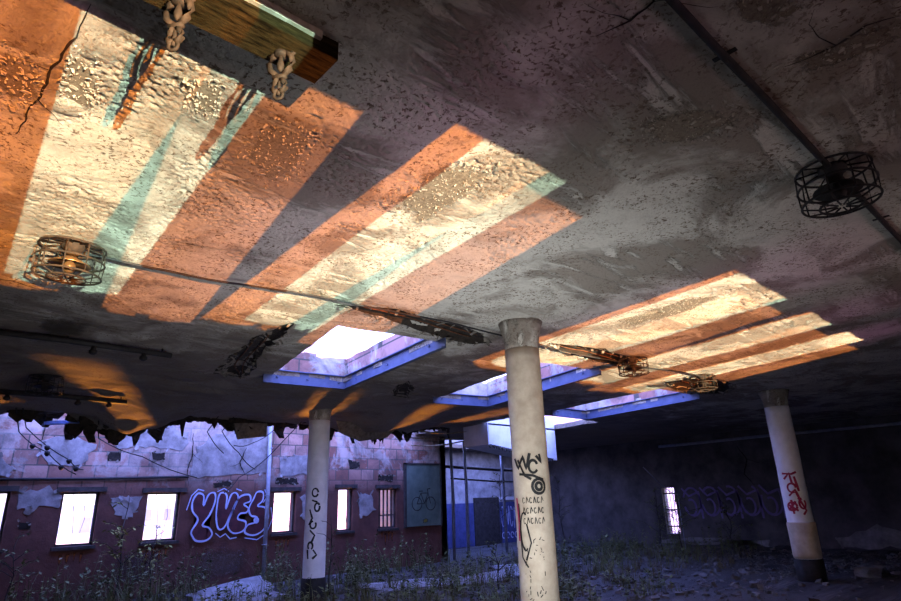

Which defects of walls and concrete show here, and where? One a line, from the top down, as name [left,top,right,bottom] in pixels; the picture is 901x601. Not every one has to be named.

crack [1,4,91,146]
peeling [0,452,16,477]
peeling [36,437,97,468]
peeling [106,425,308,490]
peeling [111,495,143,519]